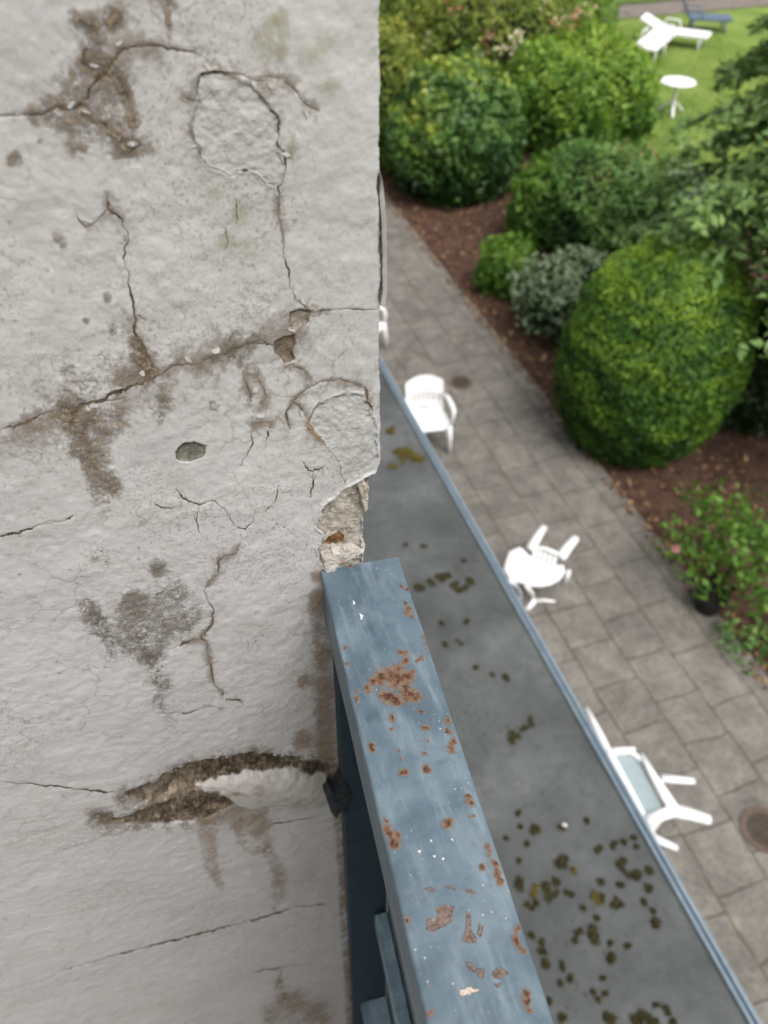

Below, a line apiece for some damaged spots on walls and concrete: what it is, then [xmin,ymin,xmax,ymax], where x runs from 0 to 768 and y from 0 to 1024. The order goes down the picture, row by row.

water stain [120,72,141,128]
crack [0,8,374,466]
spalling [275,310,311,363]
spalling [176,442,206,462]
crack [0,515,74,537]
spalling [318,477,369,573]
crack [154,486,279,714]
corrosion [294,572,349,771]
corrosion [354,635,432,773]
crack [0,781,121,794]
corrosion [479,843,504,886]
corrosion [522,989,533,1013]